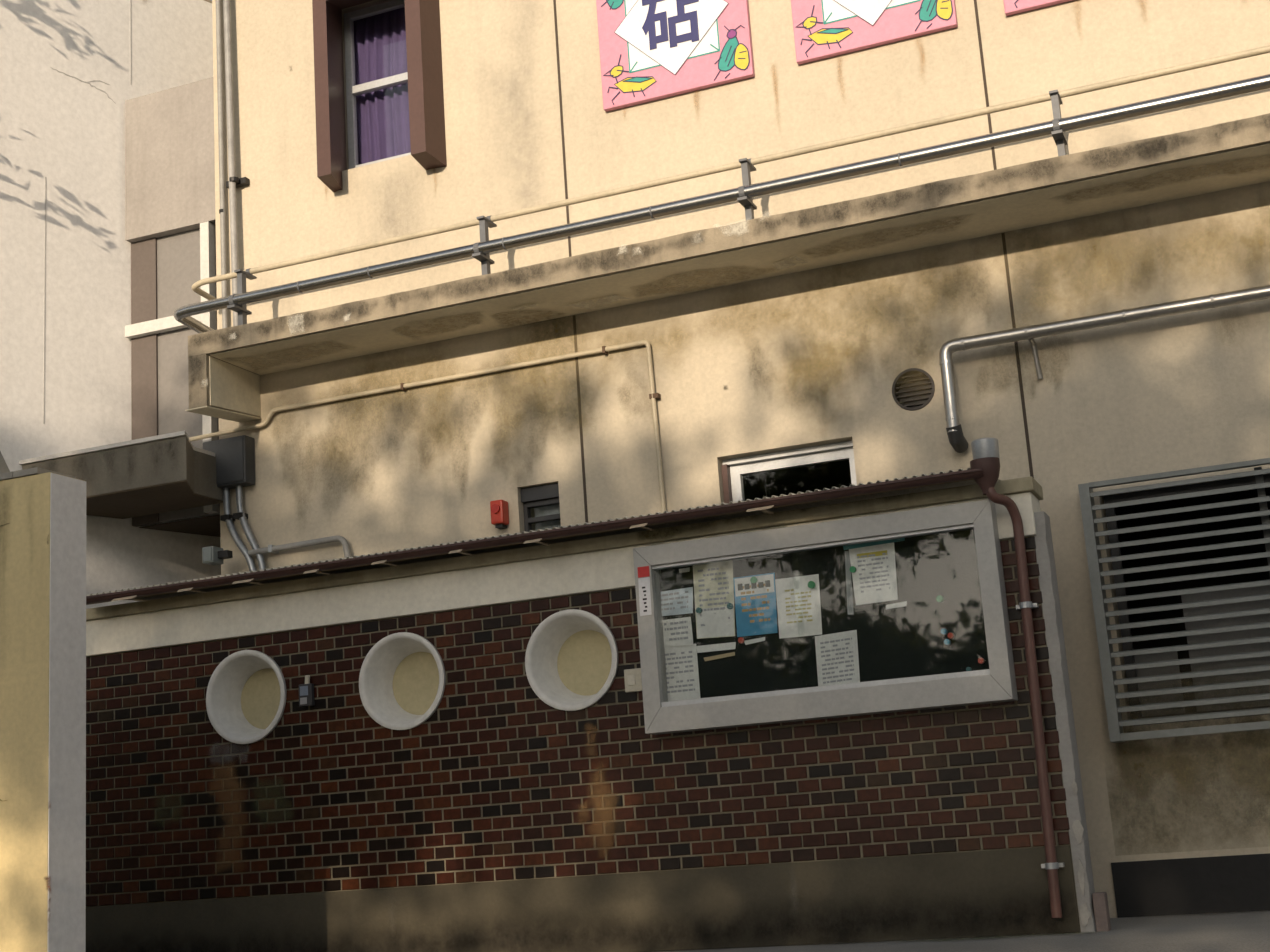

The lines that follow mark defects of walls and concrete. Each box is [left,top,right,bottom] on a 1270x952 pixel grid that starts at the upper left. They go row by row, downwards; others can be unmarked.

crack [52,68,116,104]
leakage [488,311,572,414]